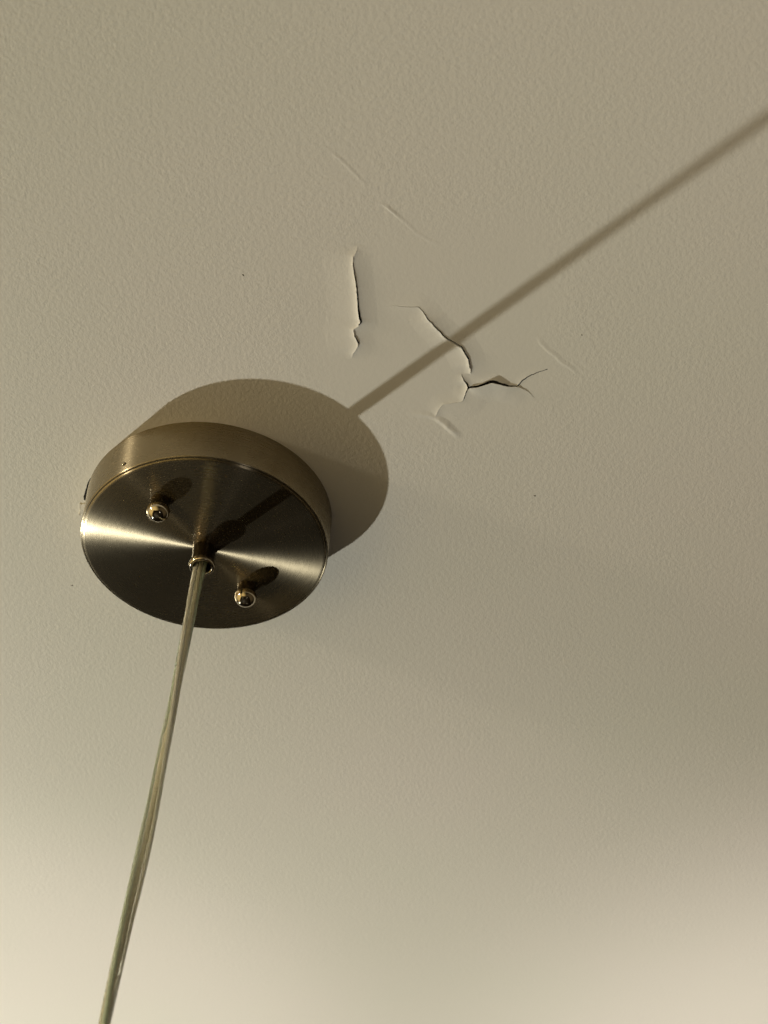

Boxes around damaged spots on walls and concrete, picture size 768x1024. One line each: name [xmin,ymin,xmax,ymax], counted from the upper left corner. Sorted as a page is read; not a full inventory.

crack [322,240,548,422]